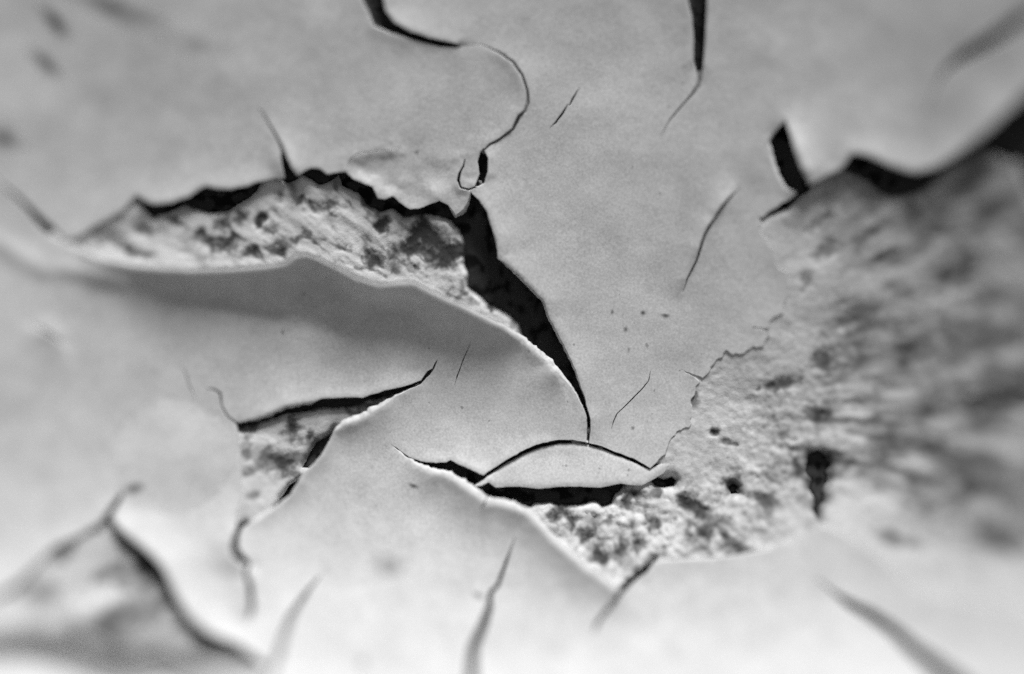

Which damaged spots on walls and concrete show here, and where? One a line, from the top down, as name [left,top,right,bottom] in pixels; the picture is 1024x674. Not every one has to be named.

crack [550,87,580,128]
crack [661,0,707,135]
crack [683,189,739,291]
peeling [49,96,1024,634]
crack [611,371,651,429]